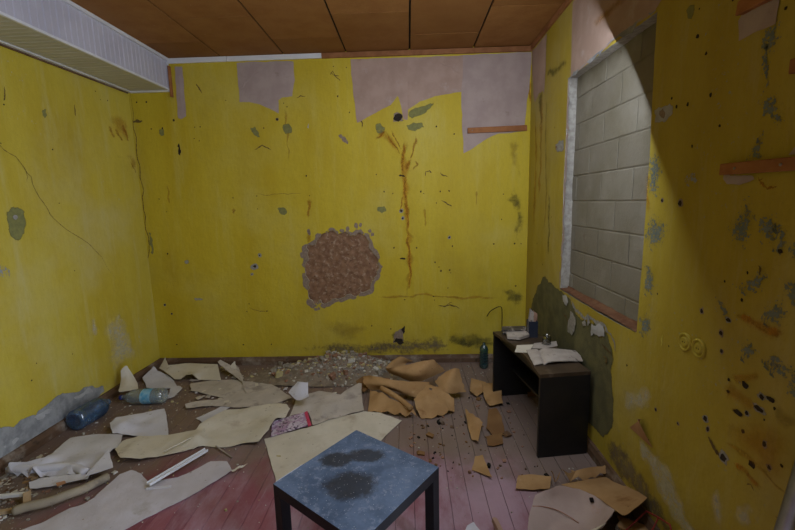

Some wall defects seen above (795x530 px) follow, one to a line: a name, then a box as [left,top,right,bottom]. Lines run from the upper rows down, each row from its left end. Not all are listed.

peeling [393,103,433,131]
peeling [758,20,785,125]
crack [131,100,150,257]
flaking render [300,223,383,311]
flaking render [531,10,656,437]
flaking render [0,386,104,458]